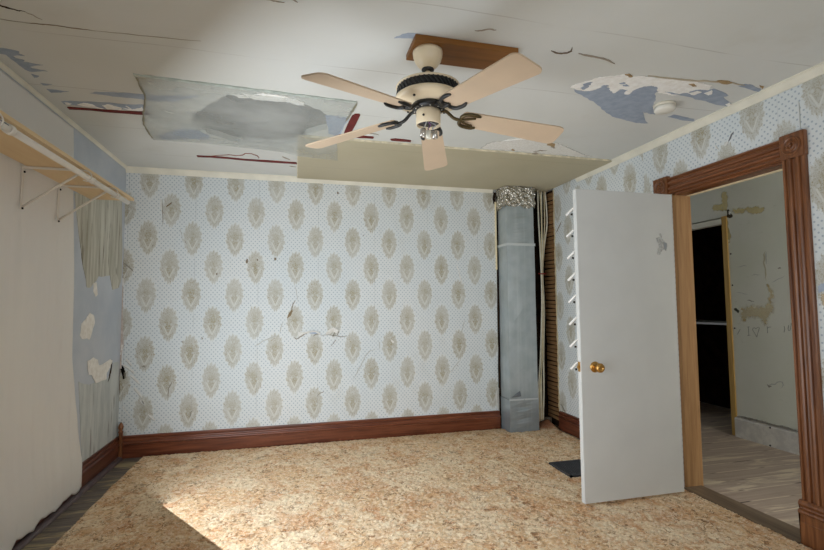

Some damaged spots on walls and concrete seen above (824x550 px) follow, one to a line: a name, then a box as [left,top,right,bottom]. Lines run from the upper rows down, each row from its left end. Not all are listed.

crack [0,5,196,41]
peeling [0,48,199,111]
peeling [571,74,764,124]
peeling [80,313,95,340]
peeling [87,357,113,383]